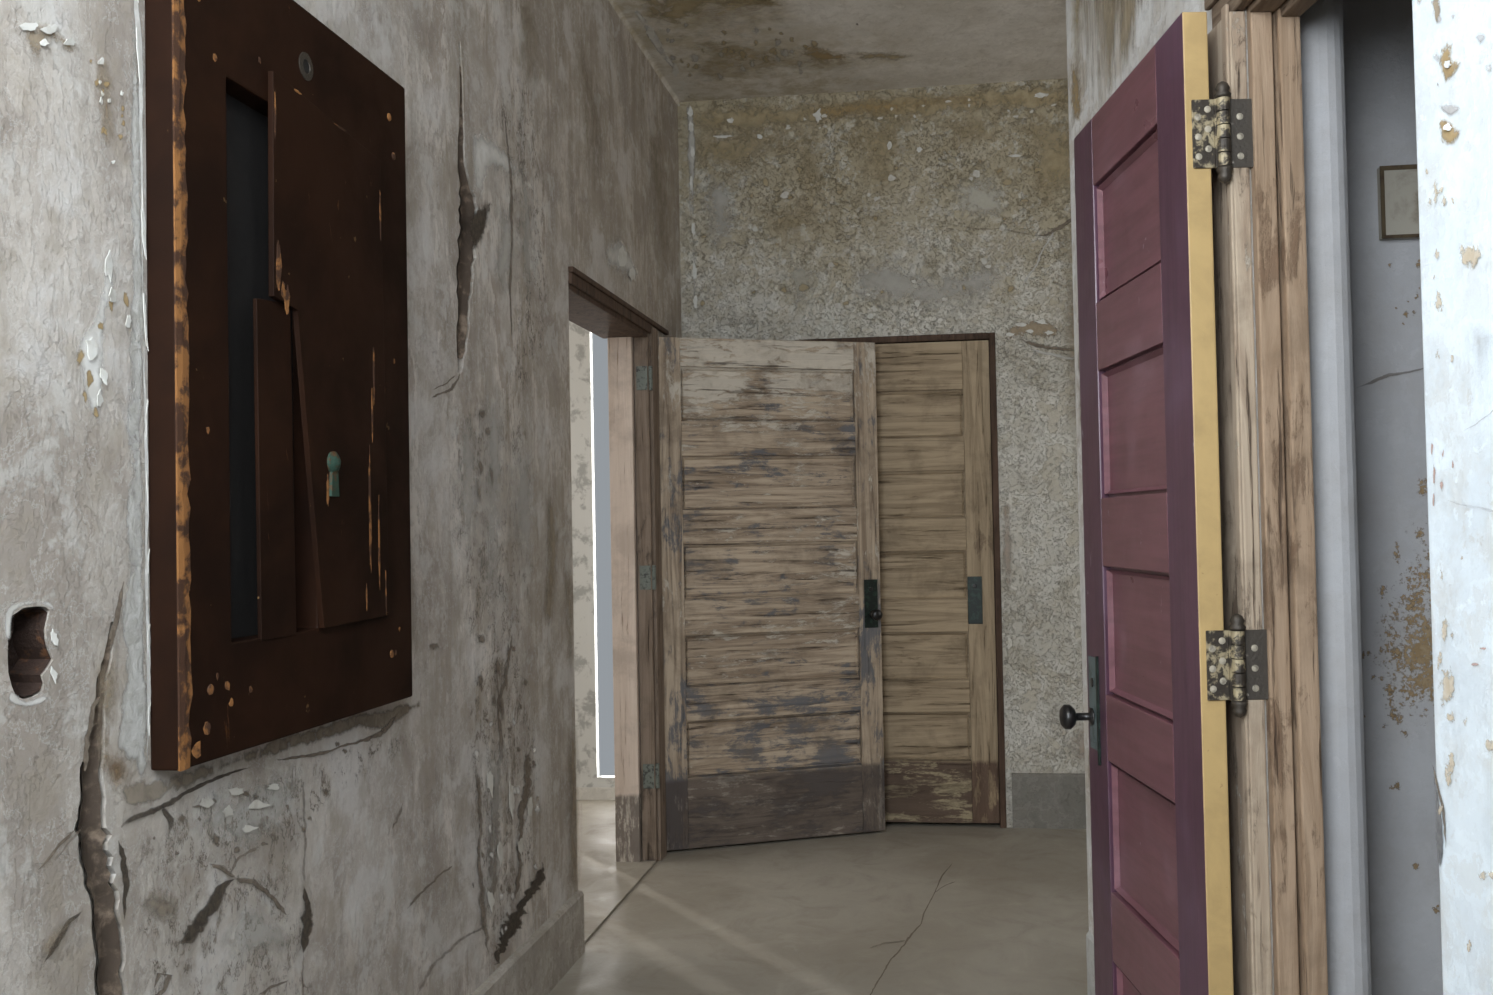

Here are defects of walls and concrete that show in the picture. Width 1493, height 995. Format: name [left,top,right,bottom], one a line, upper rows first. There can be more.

peeling [19,23,76,52]
water stain [649,0,844,79]
water stain [1075,0,1135,65]
peeling [1435,45,1458,85]
water stain [692,68,1081,192]
peeling [1439,105,1459,143]
crack [433,66,515,397]
crack [1023,219,1071,285]
peeling [77,250,149,417]
spalling [5,601,59,705]
crack [40,582,313,995]
crack [870,865,953,995]